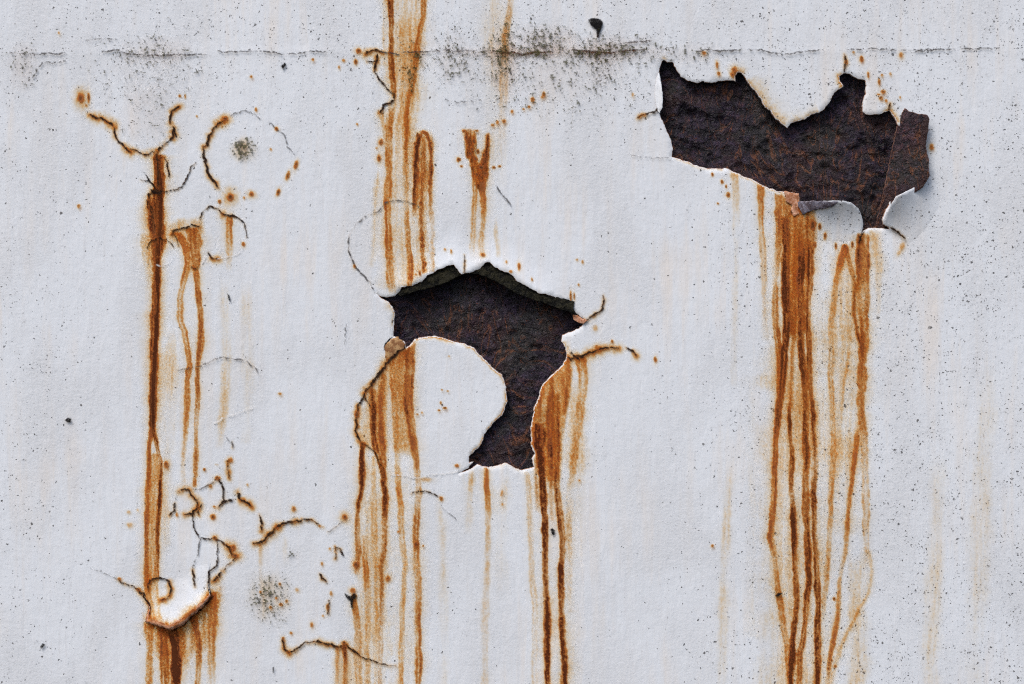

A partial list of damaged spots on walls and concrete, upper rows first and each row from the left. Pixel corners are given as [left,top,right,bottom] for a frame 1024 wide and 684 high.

crack [77,93,297,269]
crack [347,200,419,289]
corrosion [405,100,433,285]
corrosion [457,110,513,207]
peeling [655,60,930,230]
corrosion [144,155,204,586]
crack [107,407,392,669]
corrosion [356,376,399,520]
peeling [381,262,588,471]
corrosion [532,357,586,684]
corrosion [760,187,870,684]
corrosion [145,593,217,684]